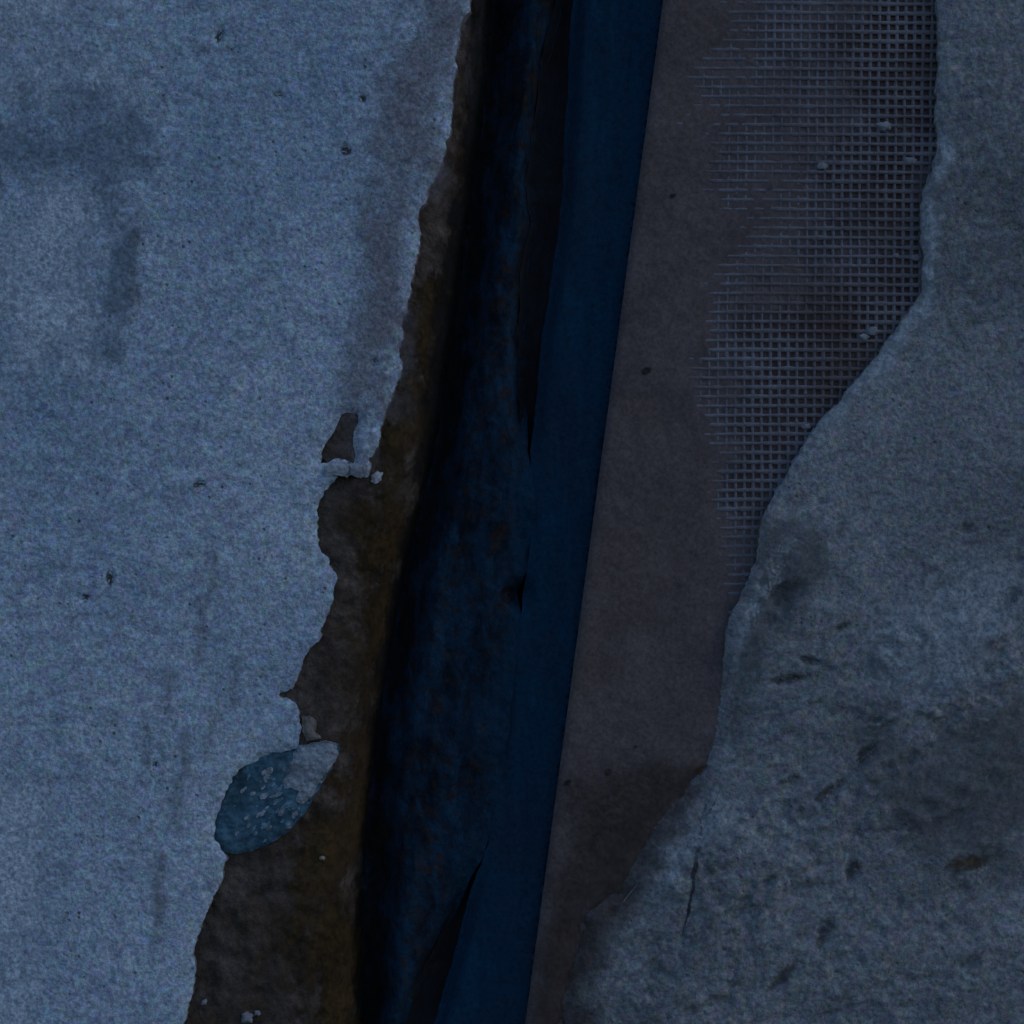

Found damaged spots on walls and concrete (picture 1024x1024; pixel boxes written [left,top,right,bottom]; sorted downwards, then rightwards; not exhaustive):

spalling [184,0,490,1024]
crack [682,790,720,935]
peeling [525,0,956,1024]